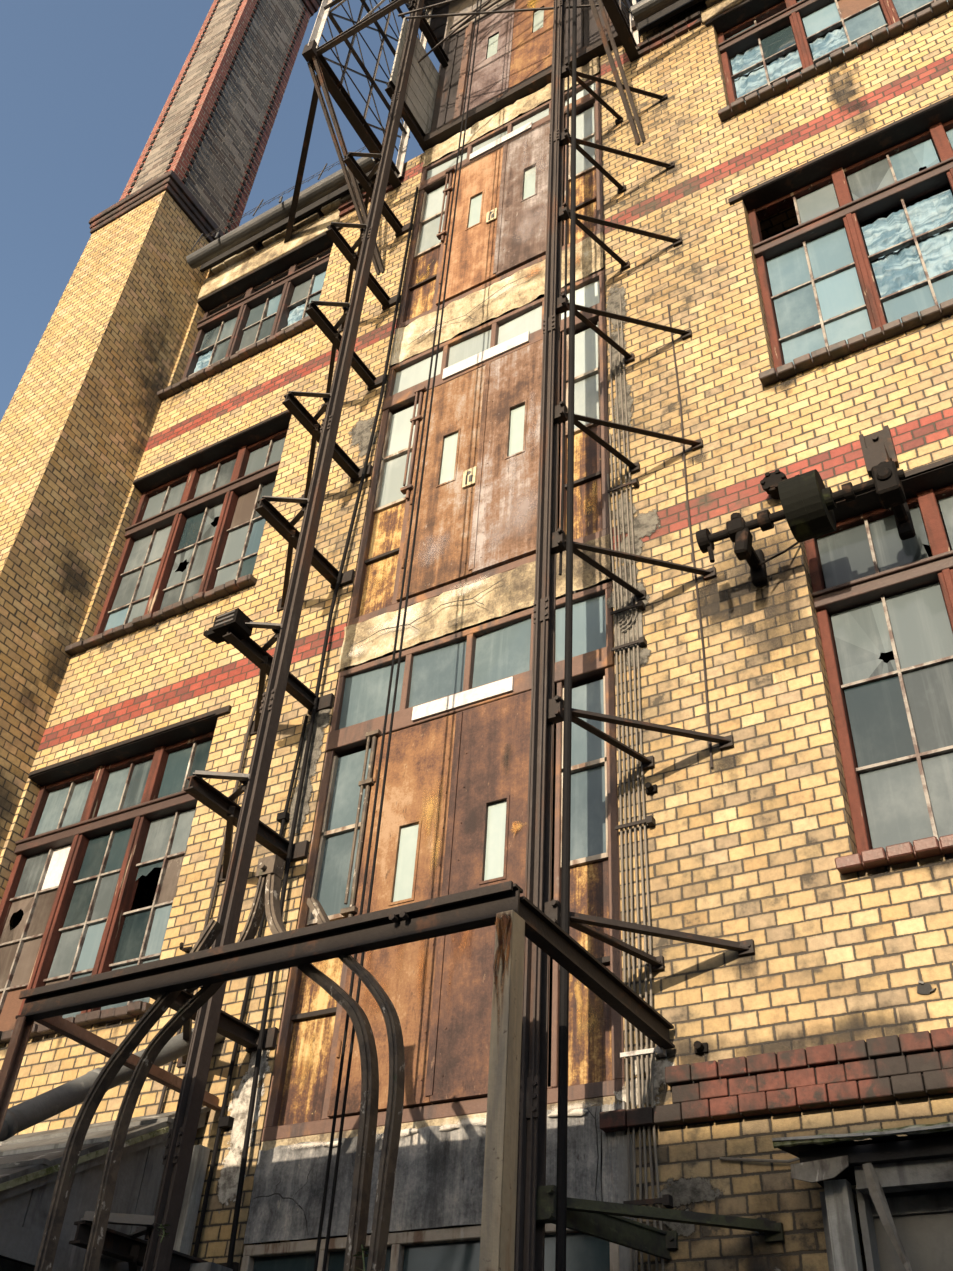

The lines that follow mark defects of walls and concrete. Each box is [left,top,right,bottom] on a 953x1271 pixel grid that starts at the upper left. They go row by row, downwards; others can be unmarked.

leakage [60,552,88,591]
leakage [383,614,415,629]
corrosion [493,913,512,1015]
peeling [247,1049,271,1089]
peeling [217,1143,246,1214]
peeling [662,1208,695,1237]